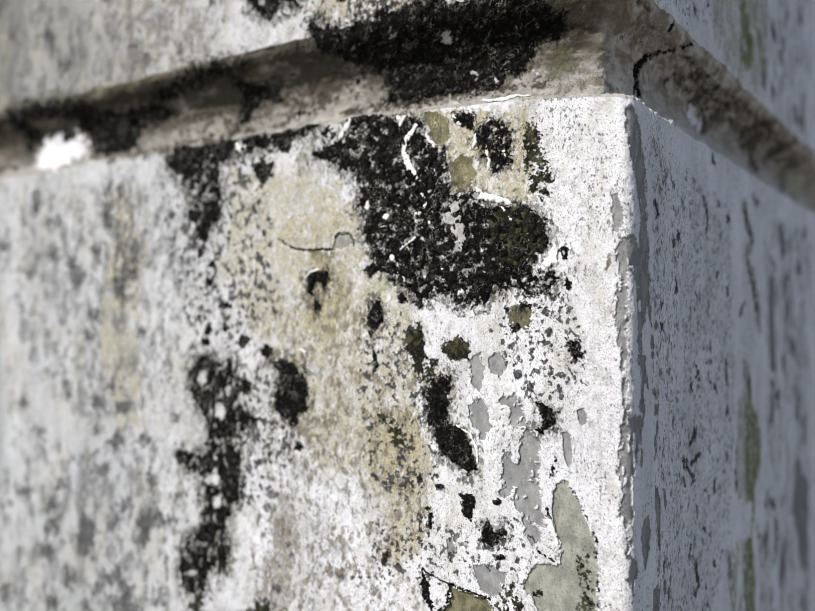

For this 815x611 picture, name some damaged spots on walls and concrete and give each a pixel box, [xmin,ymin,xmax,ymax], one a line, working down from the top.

damp [674,56,801,191]
peeling [468,352,508,440]
peeling [439,392,601,611]
peeling [610,105,667,604]
peeling [653,561,670,611]
damp [652,160,809,611]